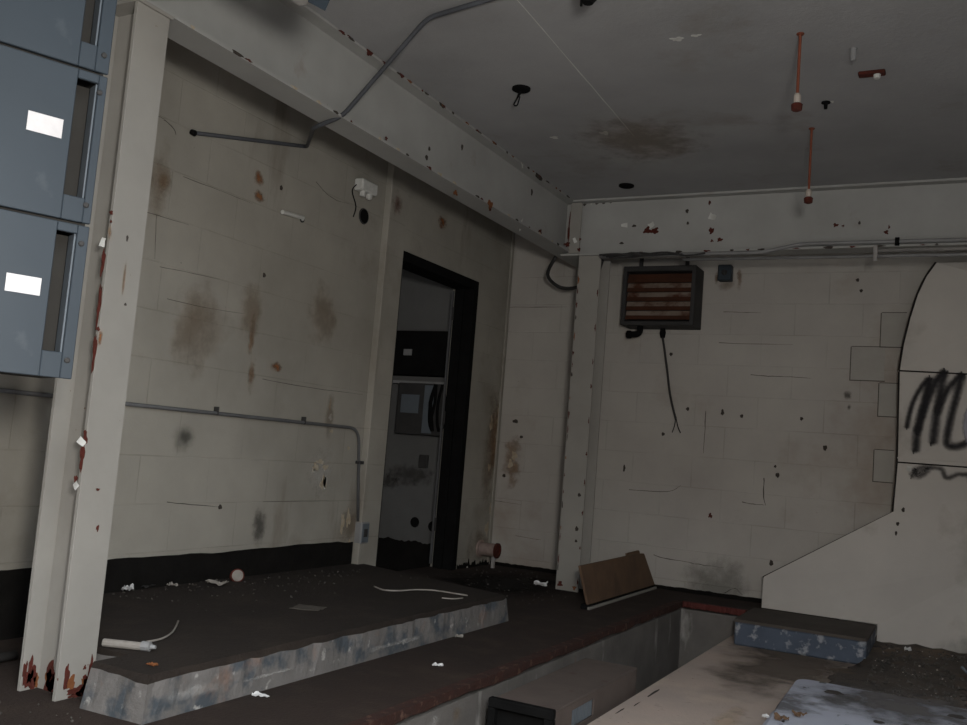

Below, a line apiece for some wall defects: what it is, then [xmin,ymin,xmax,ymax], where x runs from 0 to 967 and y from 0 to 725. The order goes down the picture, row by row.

corrosion [91,230,111,374]
corrosion [73,430,88,490]
corrosion [22,655,93,698]